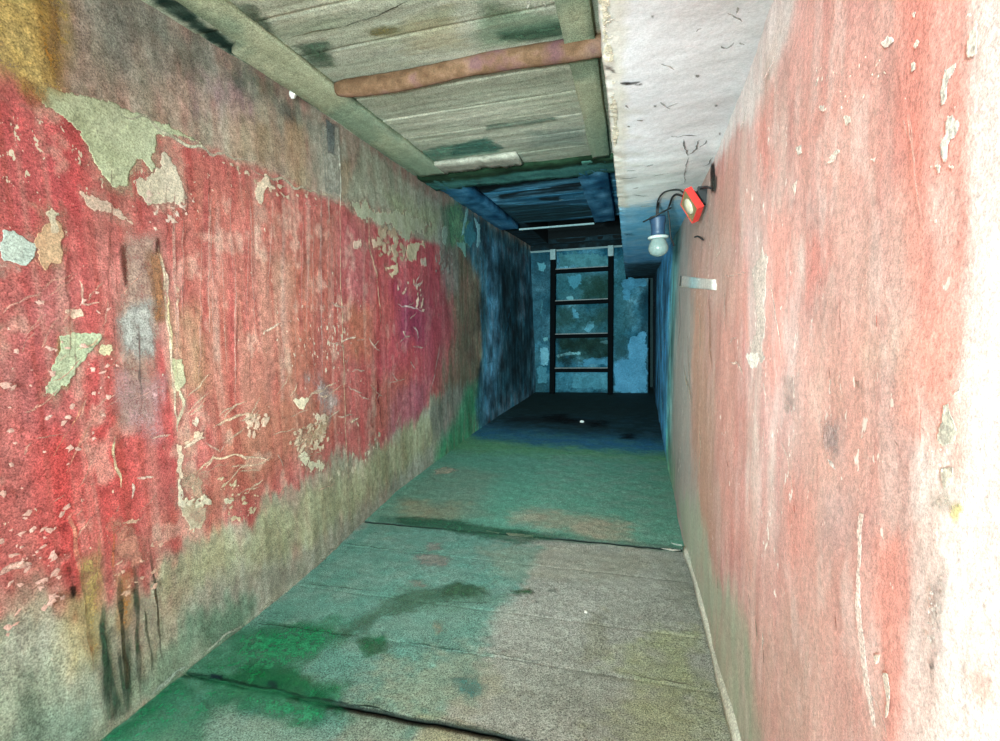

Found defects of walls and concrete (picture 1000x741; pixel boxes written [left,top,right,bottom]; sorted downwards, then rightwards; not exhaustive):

damp [502,24,562,40]
damp [453,117,555,155]
peeling [930,63,959,173]
peeling [0,208,65,270]
peeling [35,87,481,312]
peeling [45,332,119,396]
peeling [177,416,211,532]
peeling [245,413,270,439]
peeling [289,397,380,482]
peeling [0,503,71,611]
damp [70,522,162,717]
damp [444,582,483,596]